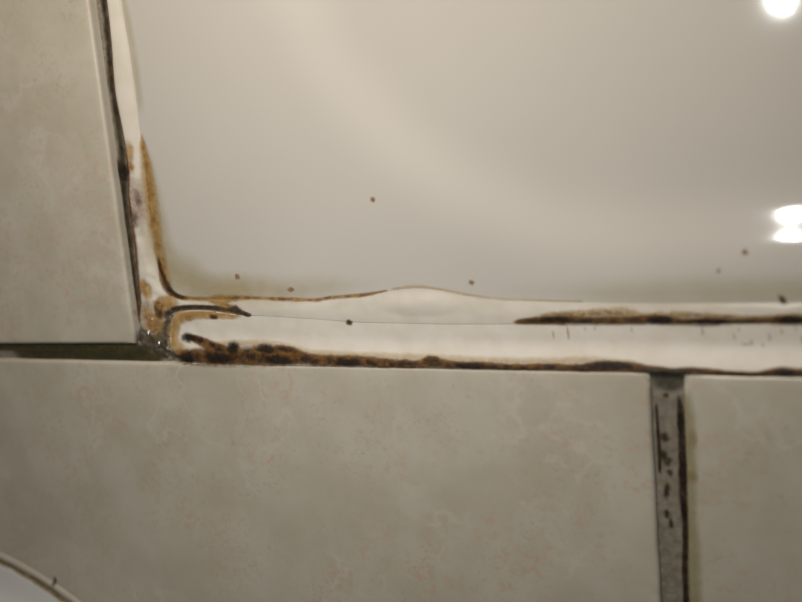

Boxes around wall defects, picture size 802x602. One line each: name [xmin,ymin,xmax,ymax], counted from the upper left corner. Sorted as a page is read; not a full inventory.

damp [101,0,145,322]
damp [176,333,802,377]
damp [515,315,802,326]
damp [655,399,689,602]